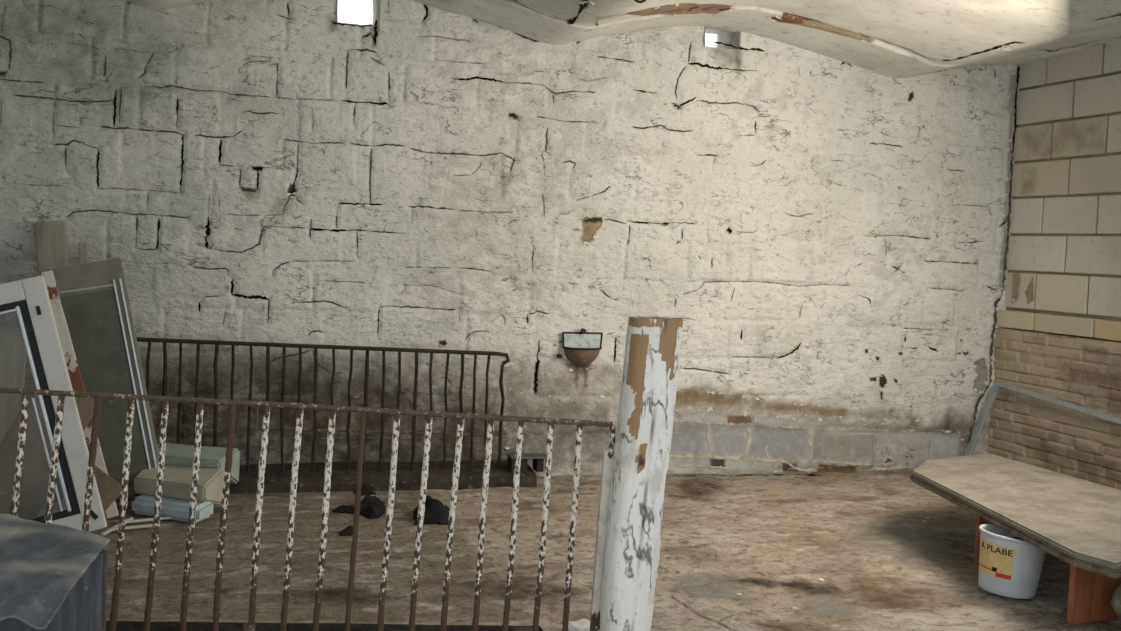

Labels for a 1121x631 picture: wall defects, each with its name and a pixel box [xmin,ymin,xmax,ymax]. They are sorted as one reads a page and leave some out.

spalling [627,4,736,16]
spalling [768,13,877,43]
crack [0,0,637,326]
crack [632,42,764,164]
crack [270,330,332,375]
crack [377,266,550,394]
spalling [582,216,602,245]
crack [575,186,871,374]
crack [862,14,1121,442]